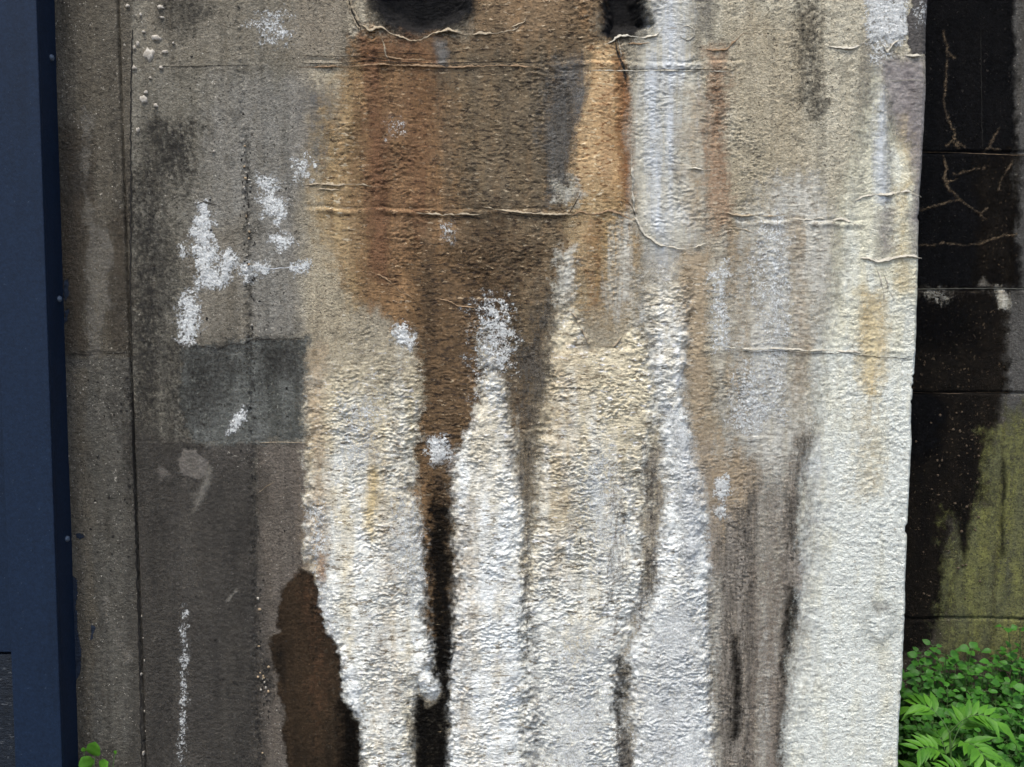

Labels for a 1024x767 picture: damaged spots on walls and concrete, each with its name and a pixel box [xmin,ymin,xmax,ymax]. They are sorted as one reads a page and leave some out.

leakage [241,9,296,48]
spalling [347,0,526,62]
spalling [598,0,664,55]
crack [920,33,1017,246]
leakage [245,162,299,254]
leakage [288,258,313,278]
corrosion [316,0,639,655]
leakage [126,179,272,767]
leakage [712,474,733,501]